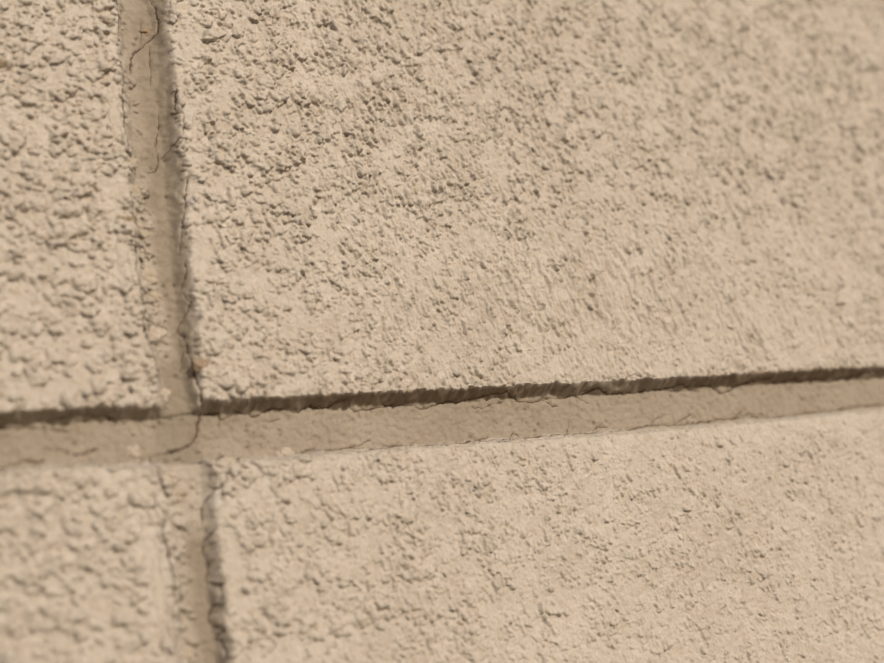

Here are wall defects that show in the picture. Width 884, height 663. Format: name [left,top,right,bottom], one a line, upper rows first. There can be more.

crack [121,2,160,152]
crack [147,84,186,174]
crack [131,197,160,384]
crack [0,412,128,469]
crack [149,178,884,663]